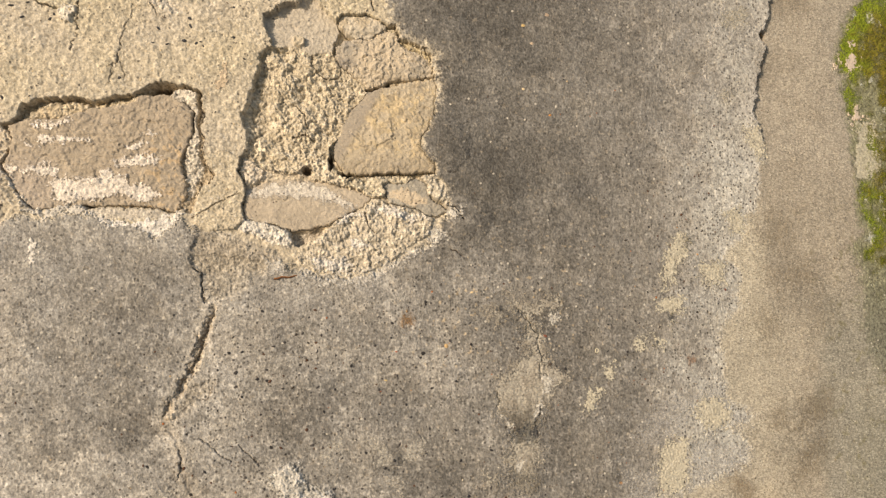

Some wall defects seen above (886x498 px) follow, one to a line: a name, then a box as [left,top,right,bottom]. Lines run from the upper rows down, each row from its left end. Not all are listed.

crack [34,0,79,50]
crack [106,0,158,86]
spalling [0,83,214,214]
crack [144,92,247,219]
crack [292,106,313,142]
spalling [239,0,449,247]
crack [292,198,376,234]
crack [165,269,217,415]
water stain [532,375,554,418]
crack [199,438,260,467]
water stain [367,437,426,494]